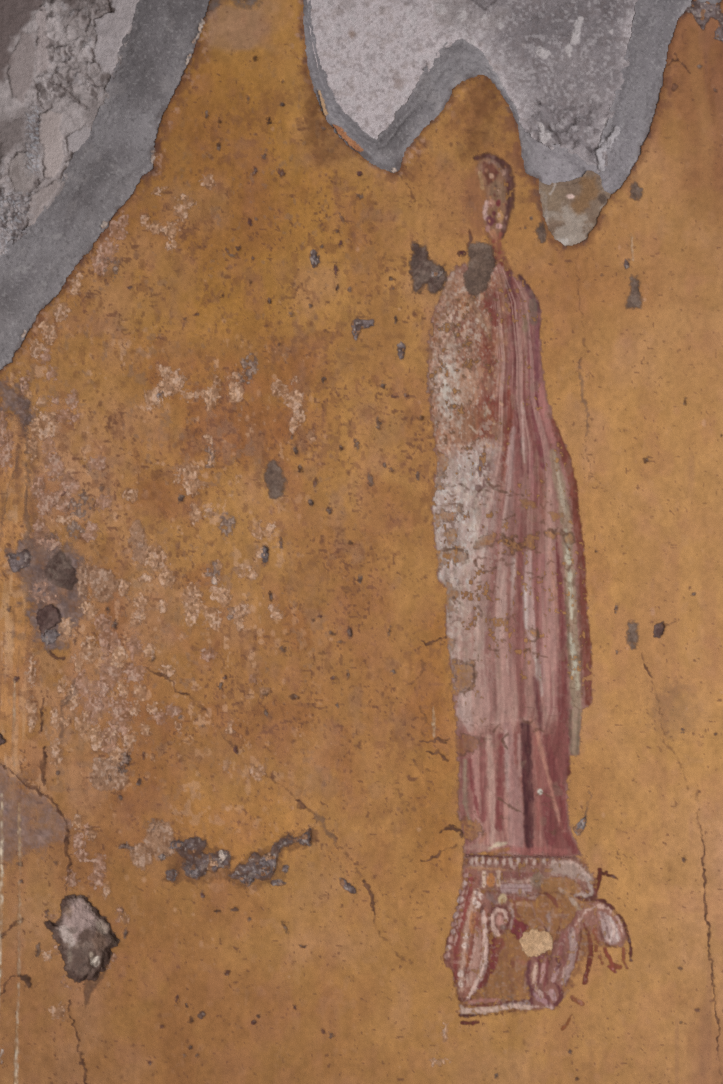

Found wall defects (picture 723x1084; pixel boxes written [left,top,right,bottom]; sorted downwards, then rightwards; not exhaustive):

flaking render [303,0,723,246]
spalling [409,243,447,293]
spalling [463,242,496,295]
spalling [624,237,642,308]
peeling [145,353,258,411]
peeling [271,376,306,472]
peeling [7,390,286,800]
spalling [653,622,665,638]
peeling [66,814,110,897]
spalling [119,819,312,887]
crack [701,840,719,1051]
crack [68,1000,87,1084]